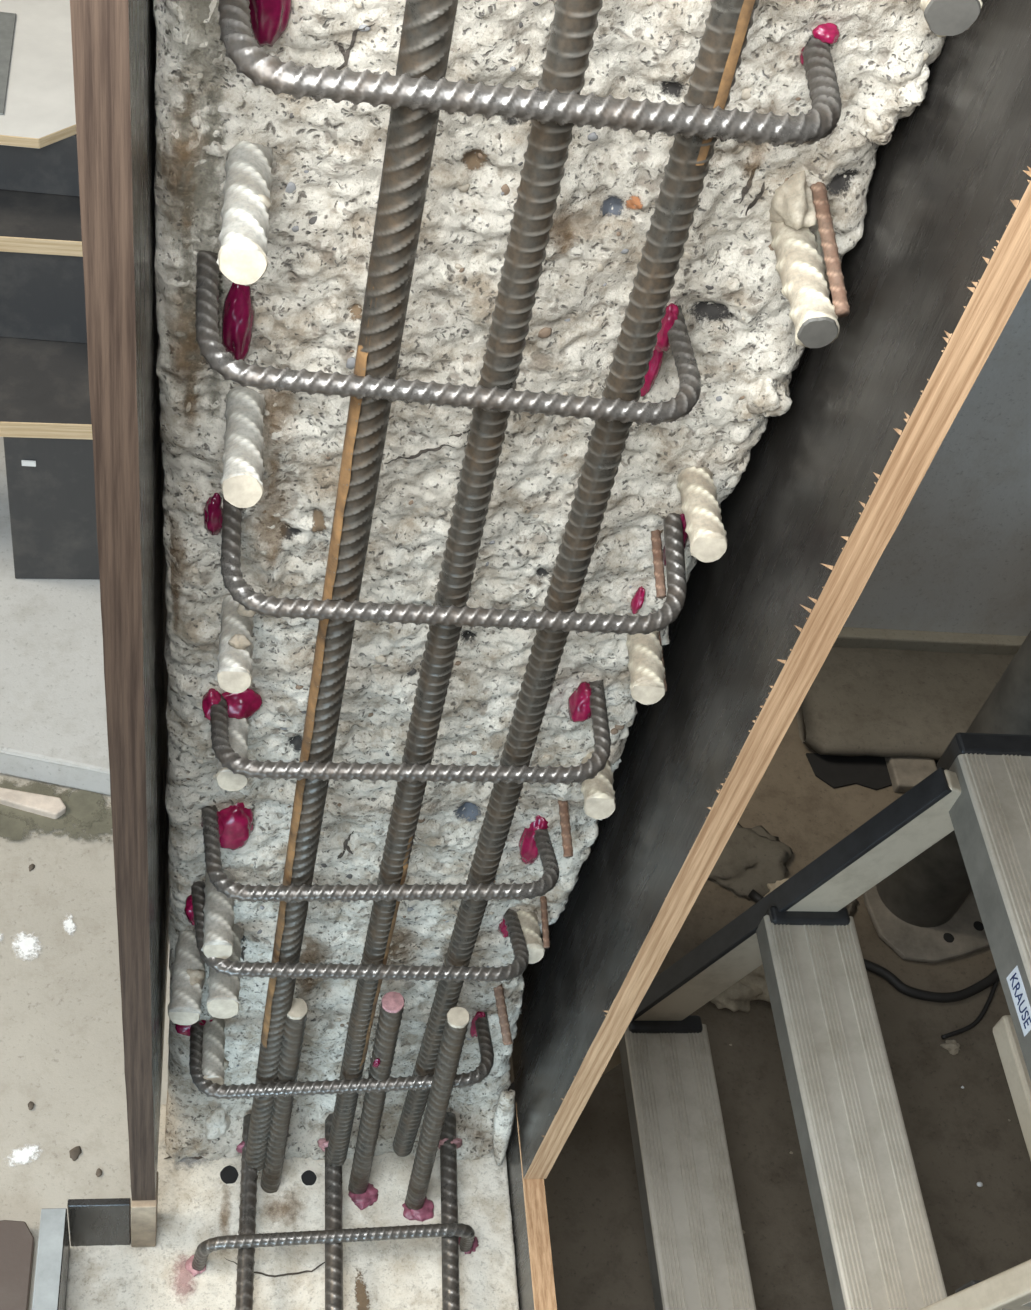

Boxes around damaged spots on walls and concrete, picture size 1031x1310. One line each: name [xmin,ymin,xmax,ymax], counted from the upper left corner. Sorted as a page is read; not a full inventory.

crack [336,23,375,70]
spalling [395,0,458,80]
spalling [331,106,440,379]
spalling [477,117,598,390]
corrosion [551,217,573,252]
corrosion [626,196,643,210]
spalling [600,134,717,402]
crack [385,430,470,464]
spalling [536,419,633,613]
spalling [235,779,347,1310]
spalling [311,624,477,1310]
corrosion [268,1202,296,1219]